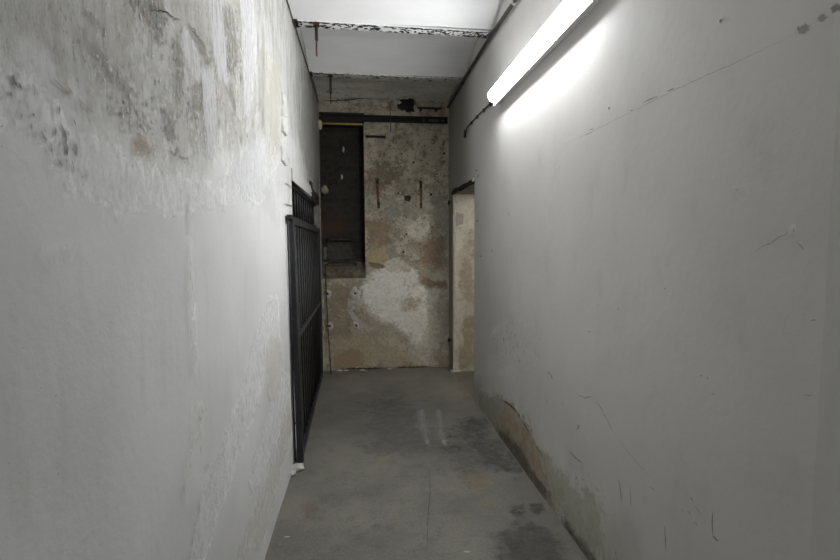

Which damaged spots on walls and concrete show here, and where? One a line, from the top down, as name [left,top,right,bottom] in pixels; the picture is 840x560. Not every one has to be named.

peeling [10,73,87,180]
peeling [78,0,277,154]
peeling [298,21,491,38]
crack [570,26,808,142]
damp [399,193,448,288]
damp [323,279,445,370]
damp [438,395,602,560]